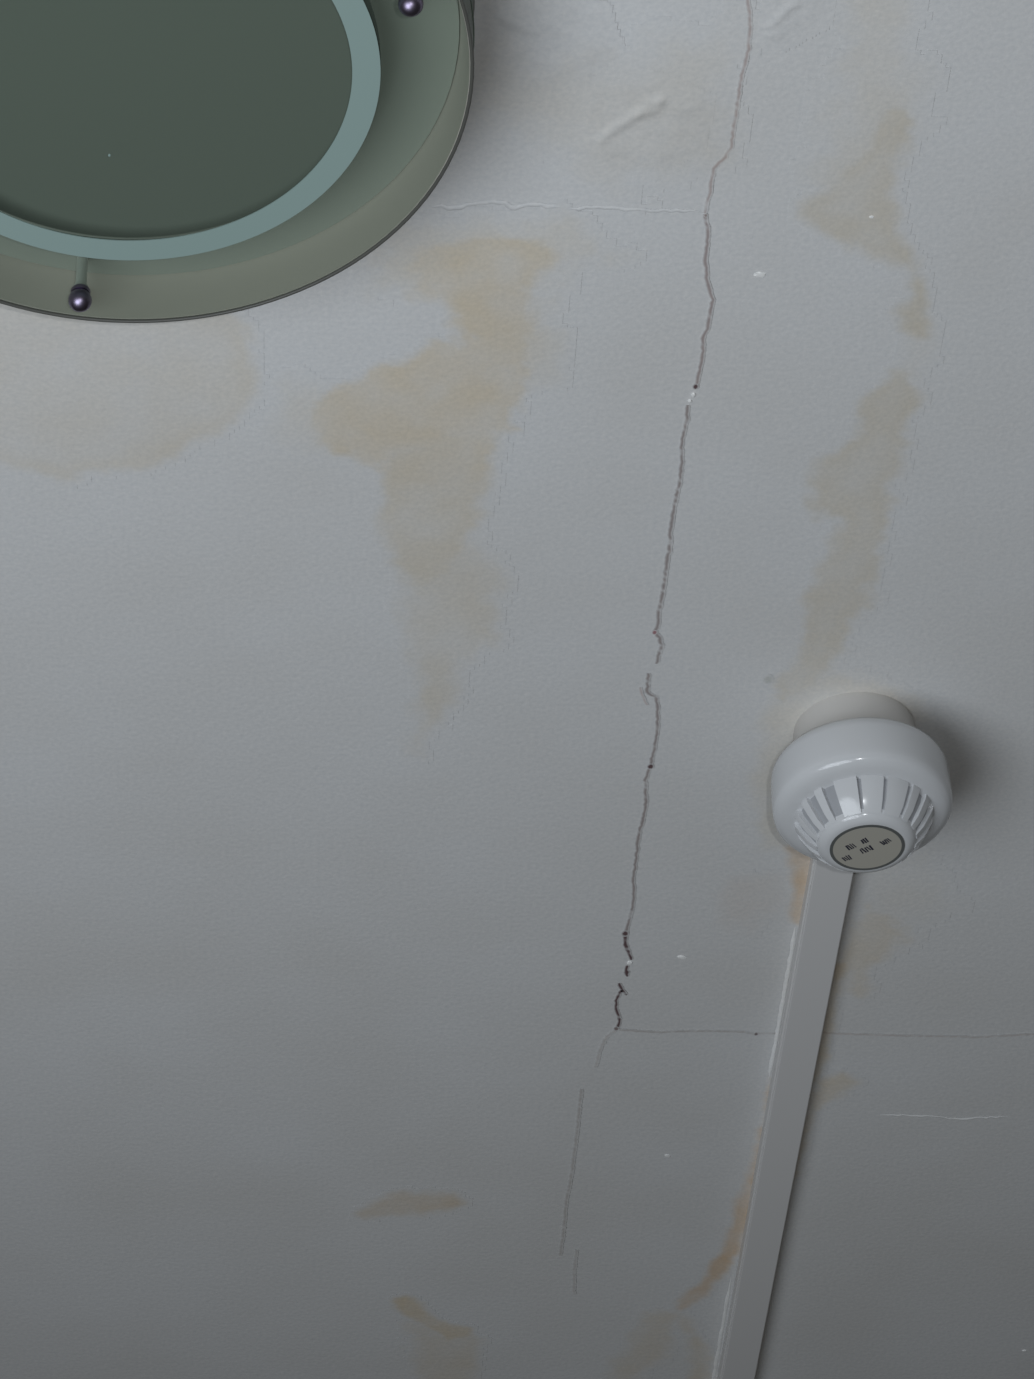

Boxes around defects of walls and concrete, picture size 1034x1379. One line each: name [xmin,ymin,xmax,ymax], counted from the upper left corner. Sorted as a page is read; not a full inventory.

leakage [0,0,762,764]
crack [558,0,776,1295]
leakage [739,0,951,857]
leakage [793,839,975,1186]